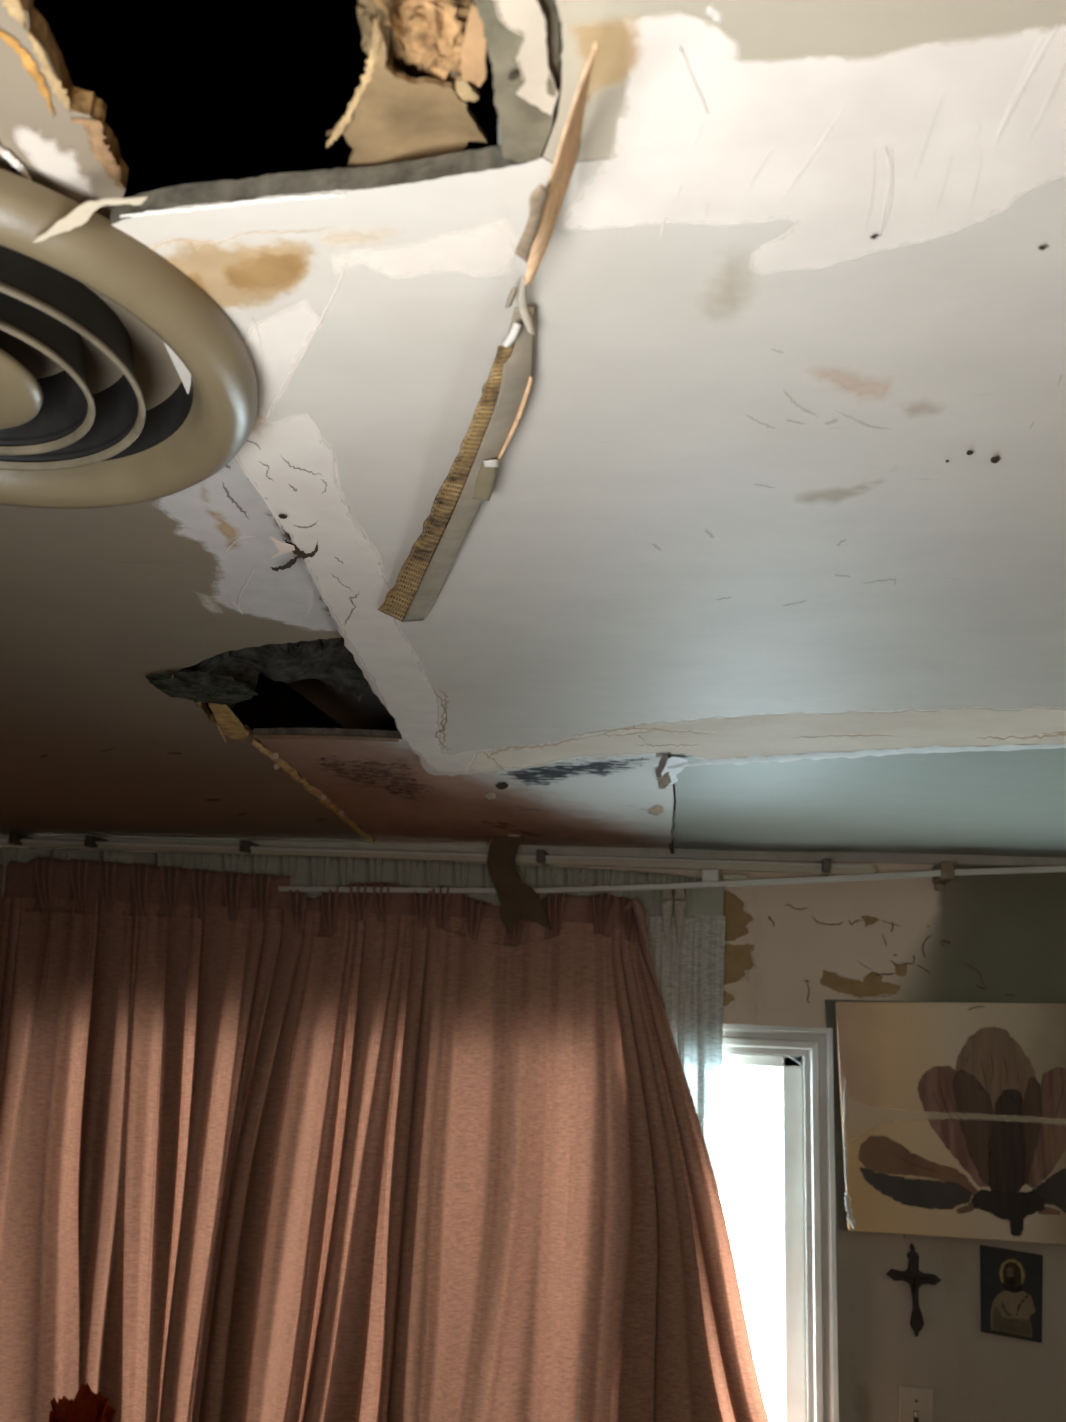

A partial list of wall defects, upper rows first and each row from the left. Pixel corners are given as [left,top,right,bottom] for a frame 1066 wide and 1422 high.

peeling [494,0,559,116]
damp [151,227,333,307]
crack [222,440,359,624]
crack [435,692,448,747]
damp [485,727,717,786]
peeling [723,890,758,1006]
peeling [820,963,907,999]
peeling [861,915,879,927]